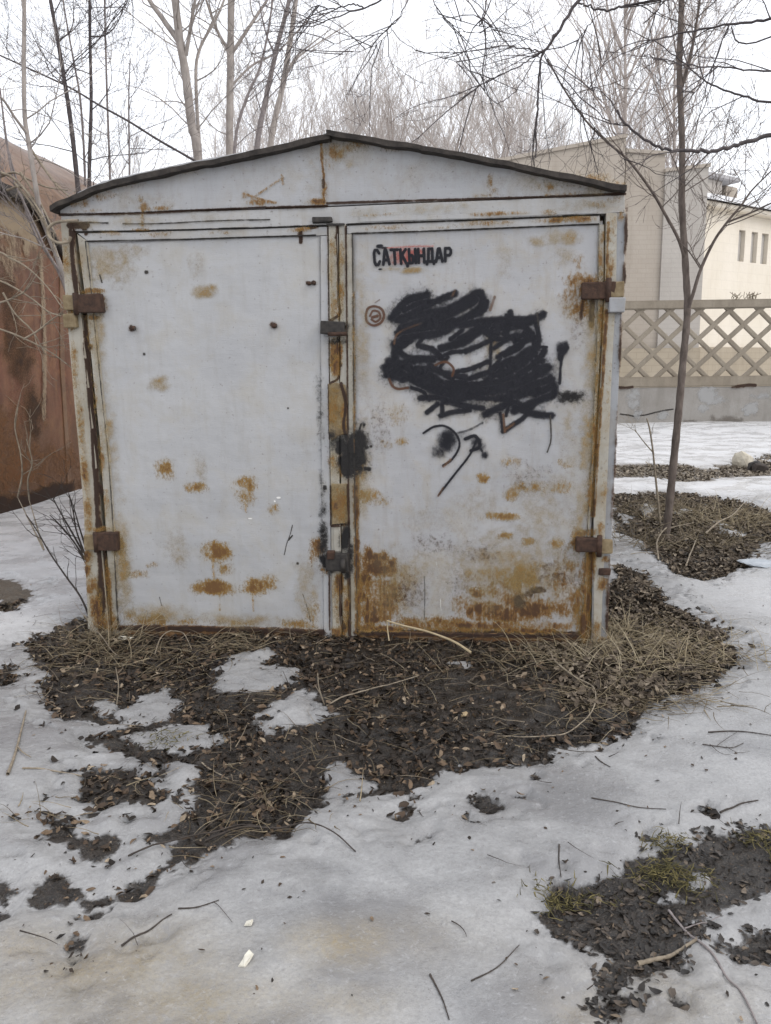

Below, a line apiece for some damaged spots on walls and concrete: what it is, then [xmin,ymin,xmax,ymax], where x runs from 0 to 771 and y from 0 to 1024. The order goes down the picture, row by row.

corrosion [0,186,132,532]
corrosion [84,174,628,647]